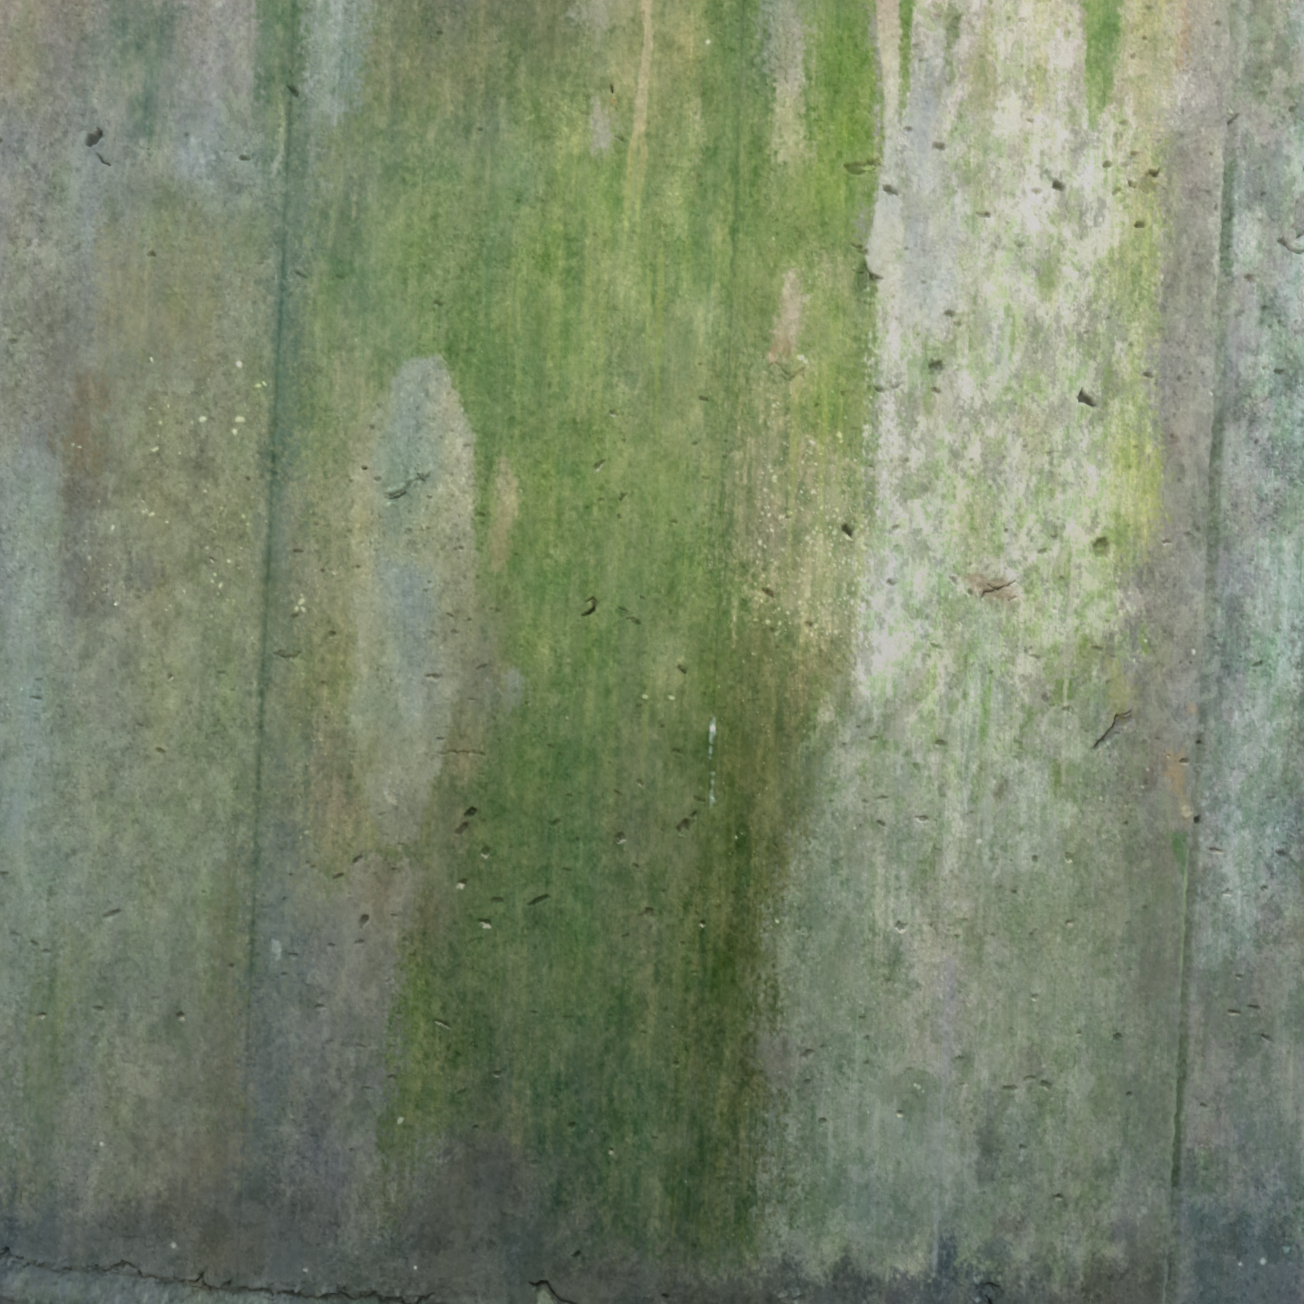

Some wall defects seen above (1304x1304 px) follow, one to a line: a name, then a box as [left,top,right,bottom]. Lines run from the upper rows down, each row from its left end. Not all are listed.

leakage [620,0,656,276]
leakage [678,94,714,213]
leakage [457,183,612,484]
leakage [642,244,675,455]
leakage [465,651,538,734]
leakage [734,1019,813,1113]
crack [0,1245,449,1304]
leakage [232,1293,309,1304]